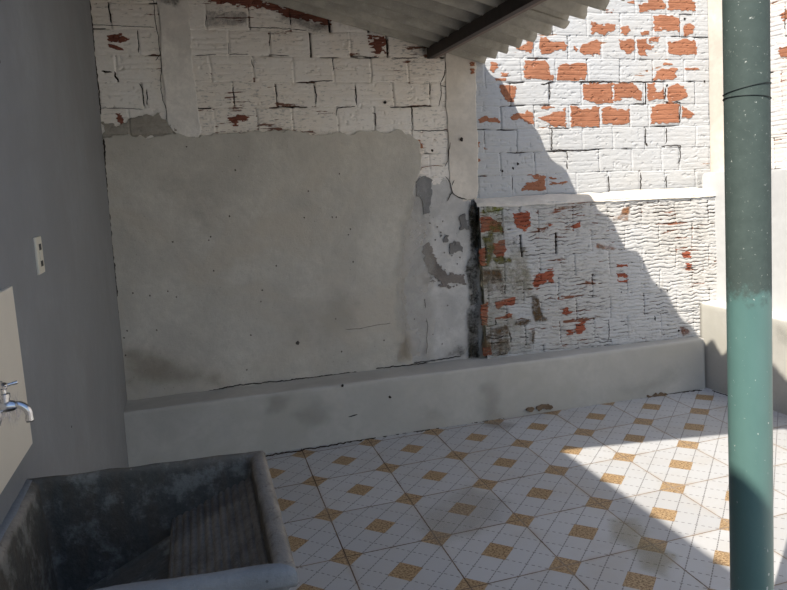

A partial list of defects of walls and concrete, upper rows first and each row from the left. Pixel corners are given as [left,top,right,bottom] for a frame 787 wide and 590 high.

peeling [366,35,387,57]
peeling [490,62,517,102]
peeling [510,0,699,128]
crack [414,130,465,201]
peeling [521,174,568,191]
spalling [416,176,466,289]
peeling [478,217,507,266]
peeling [512,211,531,232]
water stain [459,201,535,358]
peeling [533,268,554,287]
peeling [480,297,516,326]
peeling [566,321,586,335]